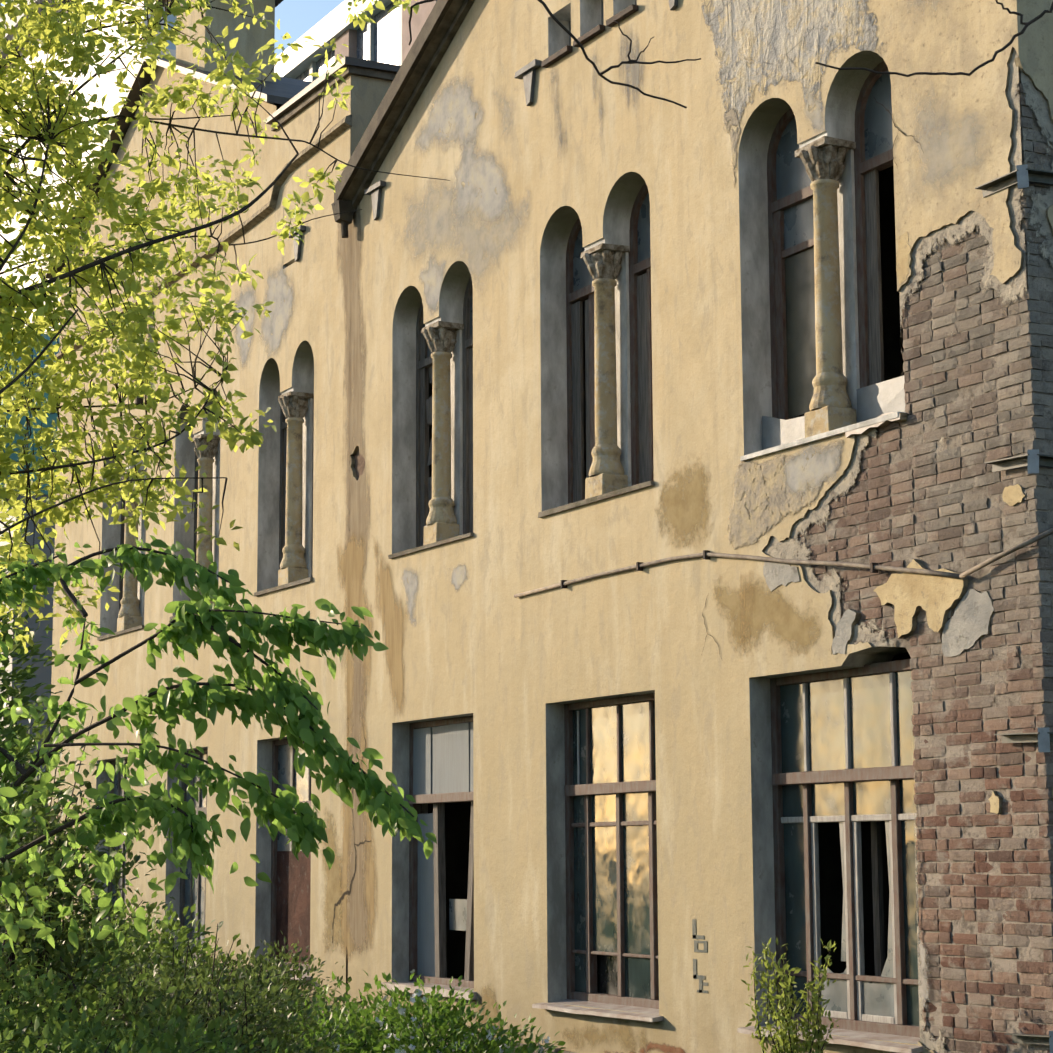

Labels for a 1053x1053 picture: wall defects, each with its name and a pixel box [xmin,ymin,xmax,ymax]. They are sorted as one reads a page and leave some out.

peeling [702,0,883,186]
leakage [337,205,404,774]
leakage [660,464,708,546]
leakage [715,582,819,652]
flaking render [727,48,1053,1053]
leakage [323,787,375,956]
crack [332,729,371,943]